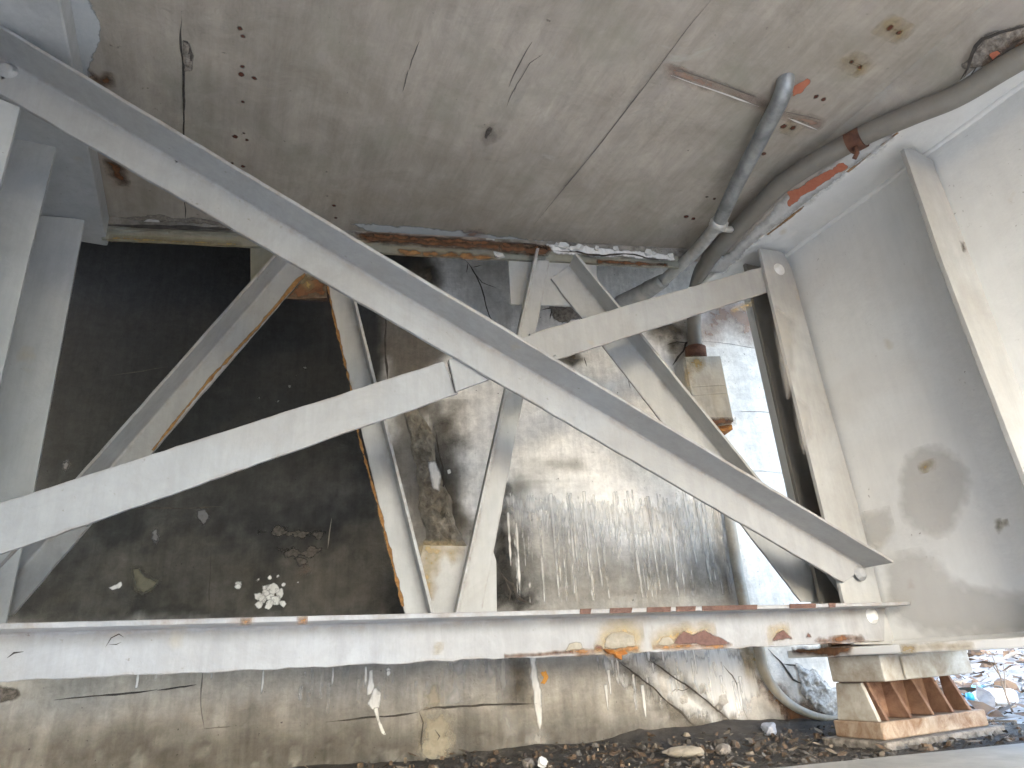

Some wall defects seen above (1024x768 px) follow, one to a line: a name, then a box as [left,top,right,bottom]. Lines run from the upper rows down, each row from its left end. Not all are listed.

crack [179,11,193,135]
crack [507,42,543,105]
spalling [960,25,1024,80]
corrosion [780,111,820,130]
corrosion [367,233,549,260]
damp [493,490,732,607]
corrosion [666,629,729,646]
corrosion [773,630,792,641]
corrosion [807,633,863,644]
spalling [795,663,838,716]
crack [330,703,528,748]